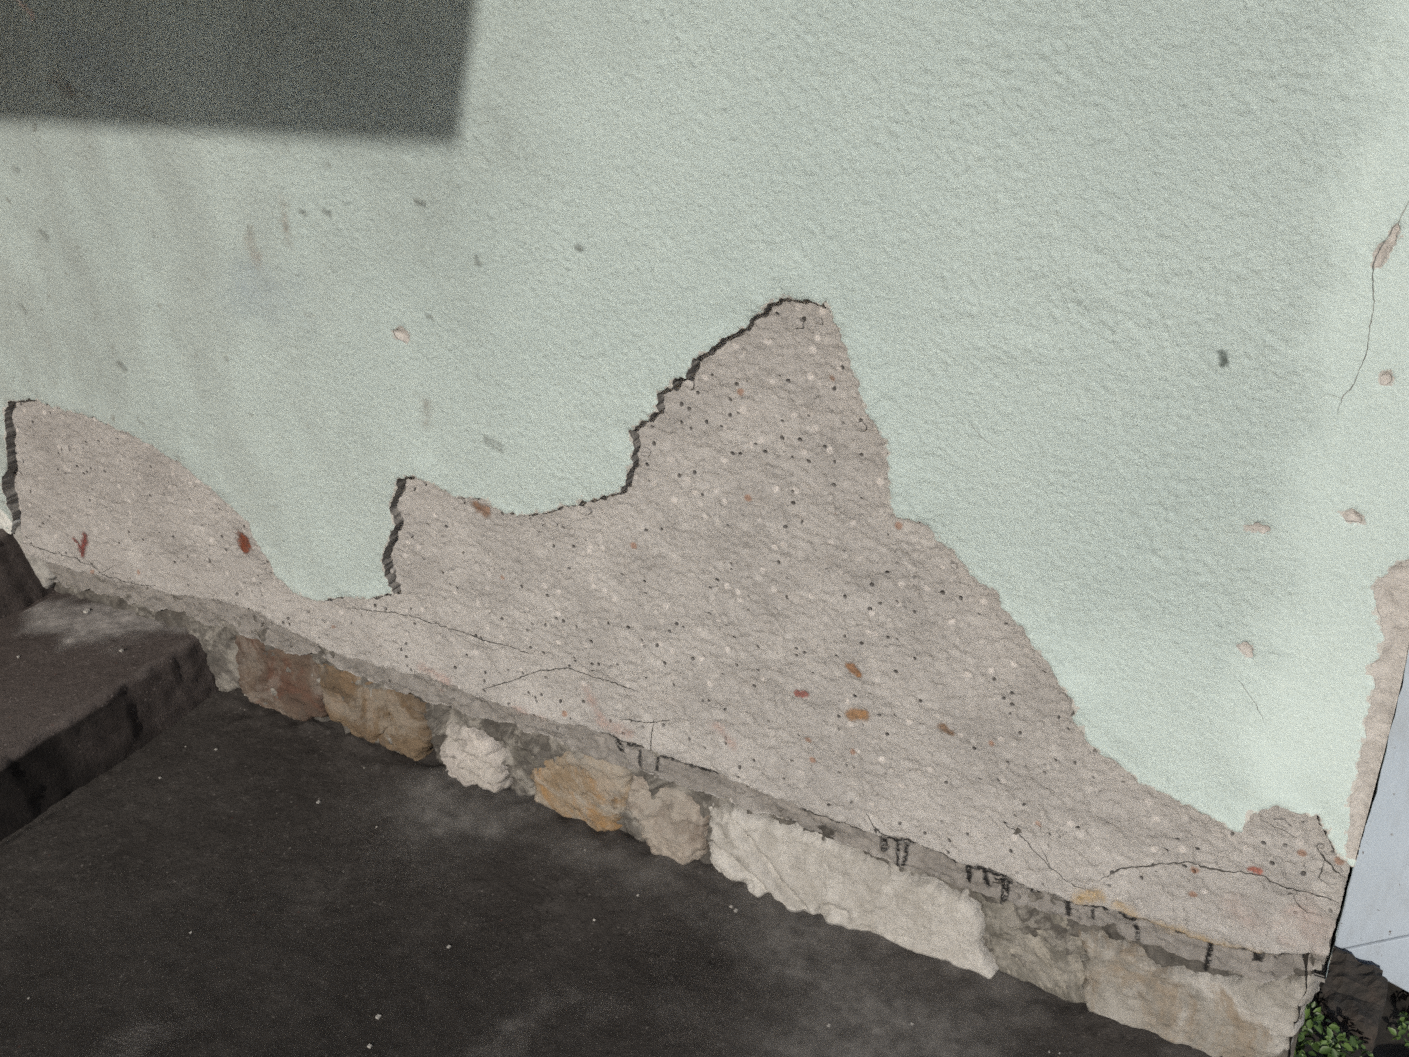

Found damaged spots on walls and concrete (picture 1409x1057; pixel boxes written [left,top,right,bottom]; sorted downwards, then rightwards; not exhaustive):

crack [1320,202,1409,414]
peeling [12,298,1409,984]
crack [1000,819,1345,915]